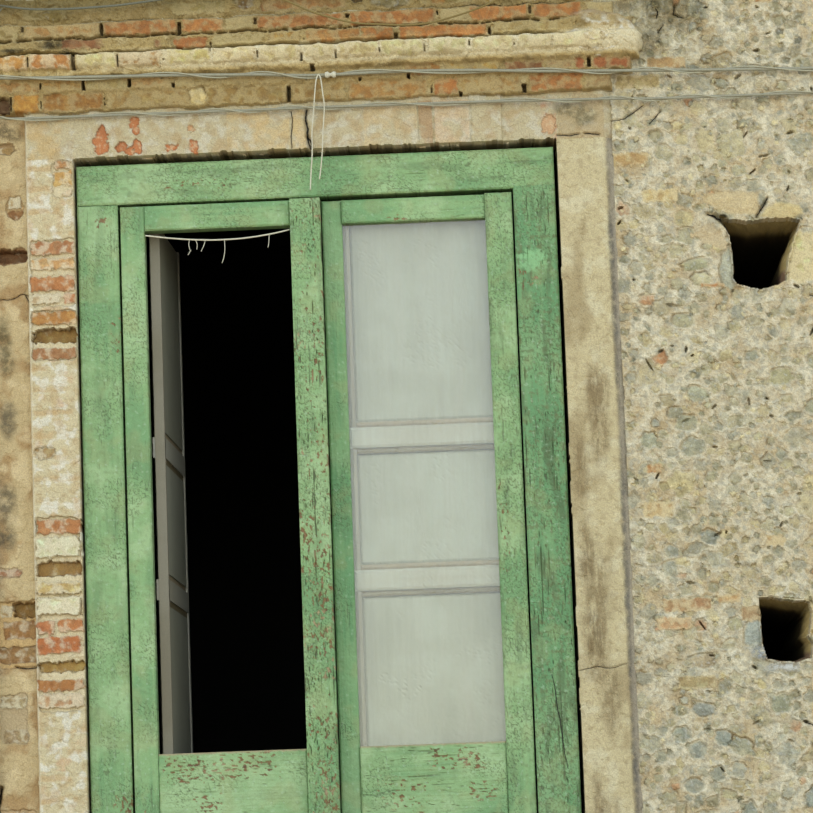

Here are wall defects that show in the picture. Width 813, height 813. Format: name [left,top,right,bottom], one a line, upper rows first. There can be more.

flaking render [93,117,142,155]
flaking render [0,238,80,361]
flaking render [35,447,55,460]
flaking render [0,516,89,713]
flaking render [0,692,29,744]